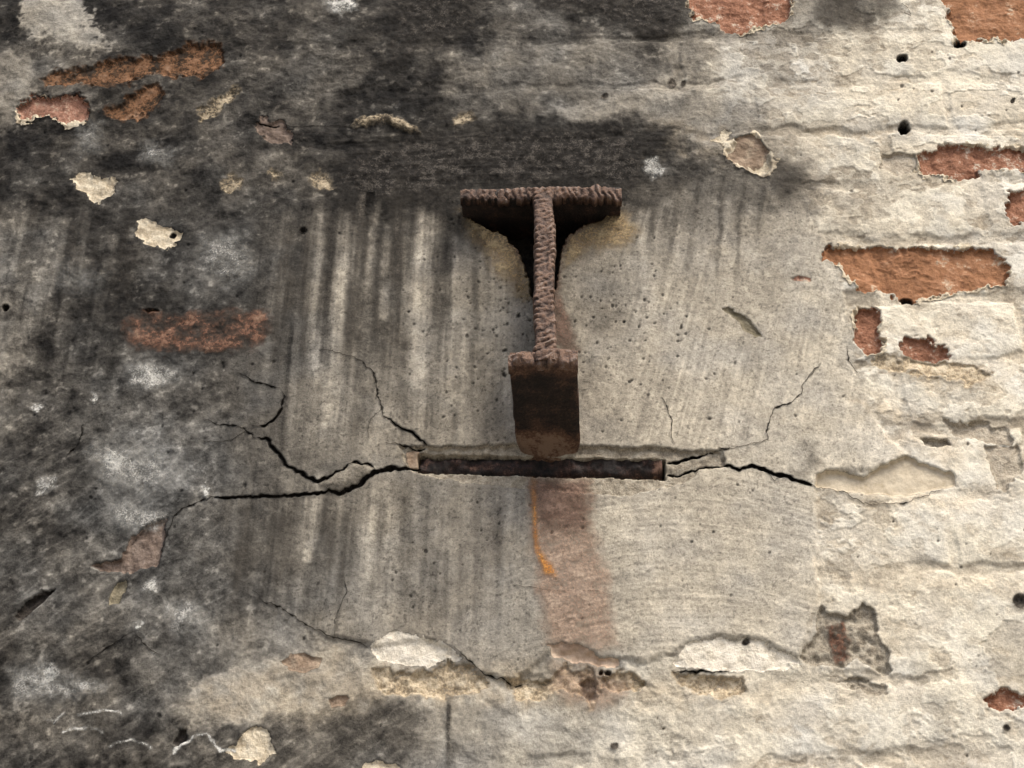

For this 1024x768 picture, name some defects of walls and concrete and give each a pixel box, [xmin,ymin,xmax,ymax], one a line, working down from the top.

water stain [328,0,355,12]
spalling [941,0,1024,46]
spalling [879,141,1024,184]
water stain [345,192,366,348]
corrosion [471,221,529,298]
corrosion [565,214,636,264]
spalling [822,241,1012,305]
peeling [850,306,993,388]
crack [135,349,427,567]
crack [662,365,943,505]
corrosion [529,481,612,649]
spalling [672,603,892,700]